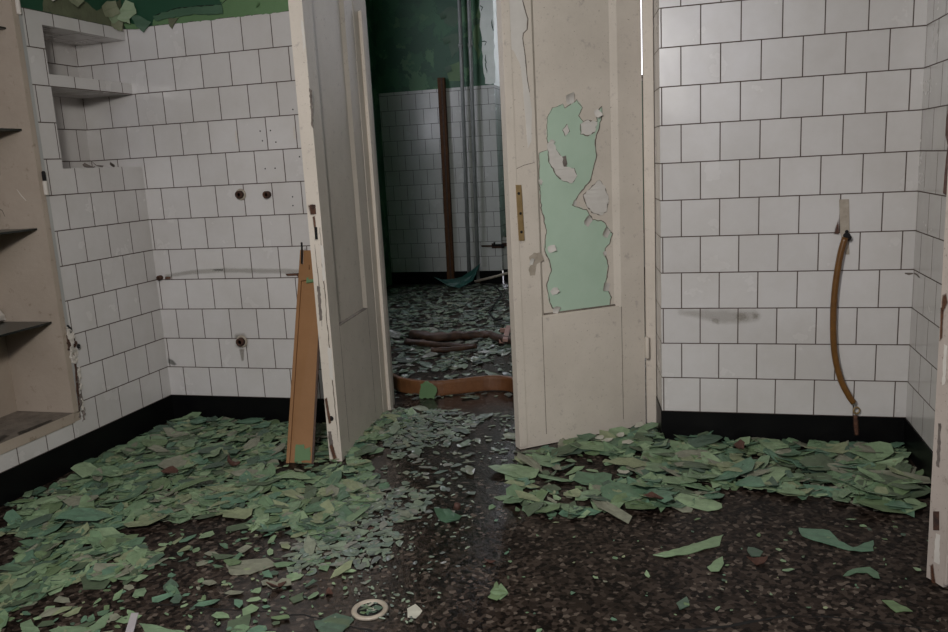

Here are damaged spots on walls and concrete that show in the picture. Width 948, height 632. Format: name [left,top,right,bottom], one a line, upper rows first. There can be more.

peeling [43,0,289,32]
peeling [529,92,613,314]